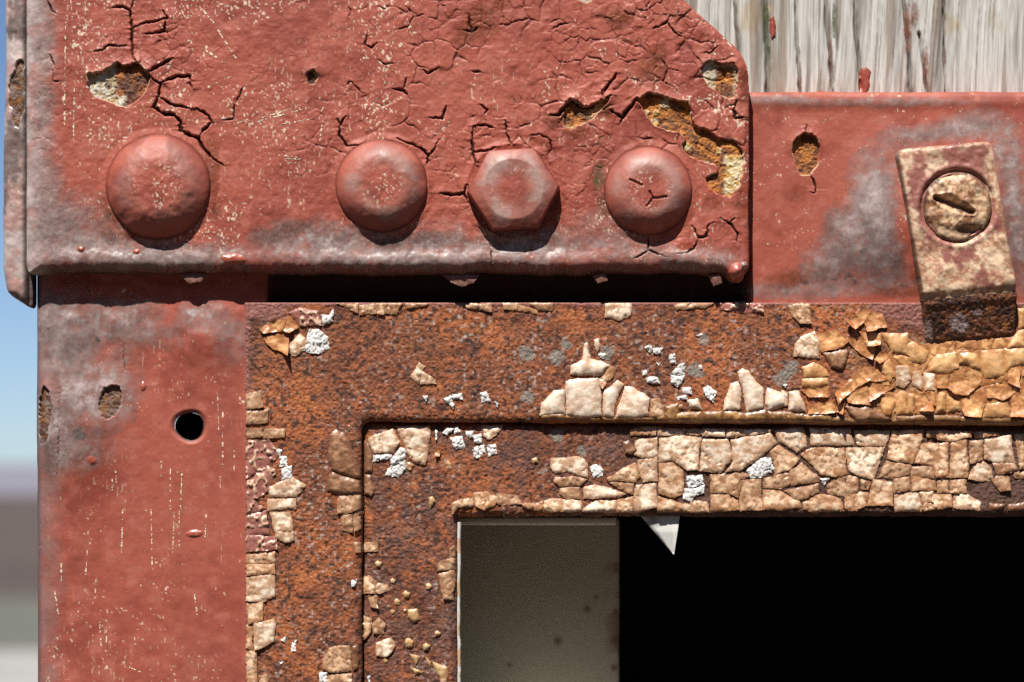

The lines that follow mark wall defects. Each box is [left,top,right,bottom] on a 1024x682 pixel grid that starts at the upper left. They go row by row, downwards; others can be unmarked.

crack [97,6,168,53]
crack [149,60,243,161]
crack [365,38,435,95]
crack [399,139,434,164]
crack [471,75,637,163]
spalling [637,93,743,197]
crack [688,219,738,252]
peeling [260,301,431,356]
peeling [674,301,764,314]
peeling [451,301,1024,514]
peeling [245,390,306,682]
peeling [319,424,504,682]